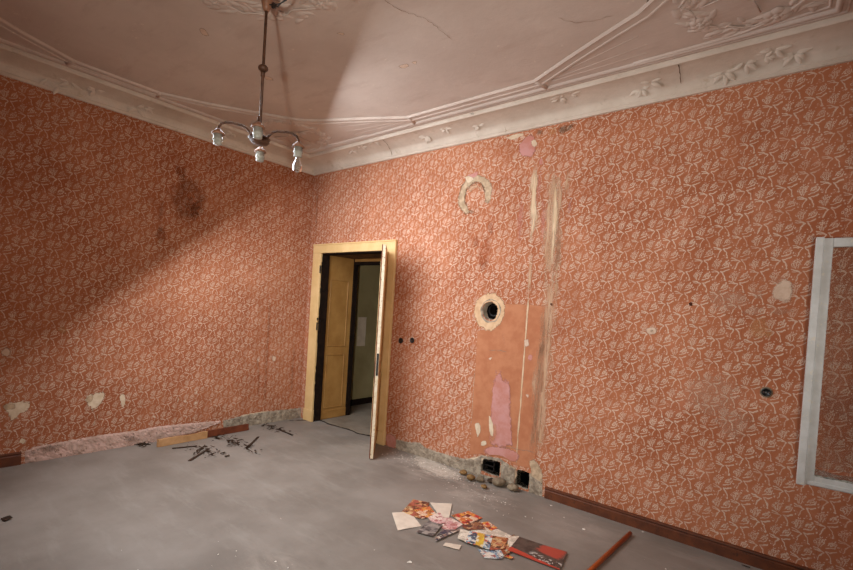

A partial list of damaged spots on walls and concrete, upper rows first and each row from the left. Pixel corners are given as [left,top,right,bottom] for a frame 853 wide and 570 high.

peeling [772,279,792,302]
spalling [474,293,505,331]
peeling [3,401,30,420]
peeling [85,392,104,424]
spalling [19,408,301,463]
peeling [396,372,519,485]
spalling [529,460,543,496]